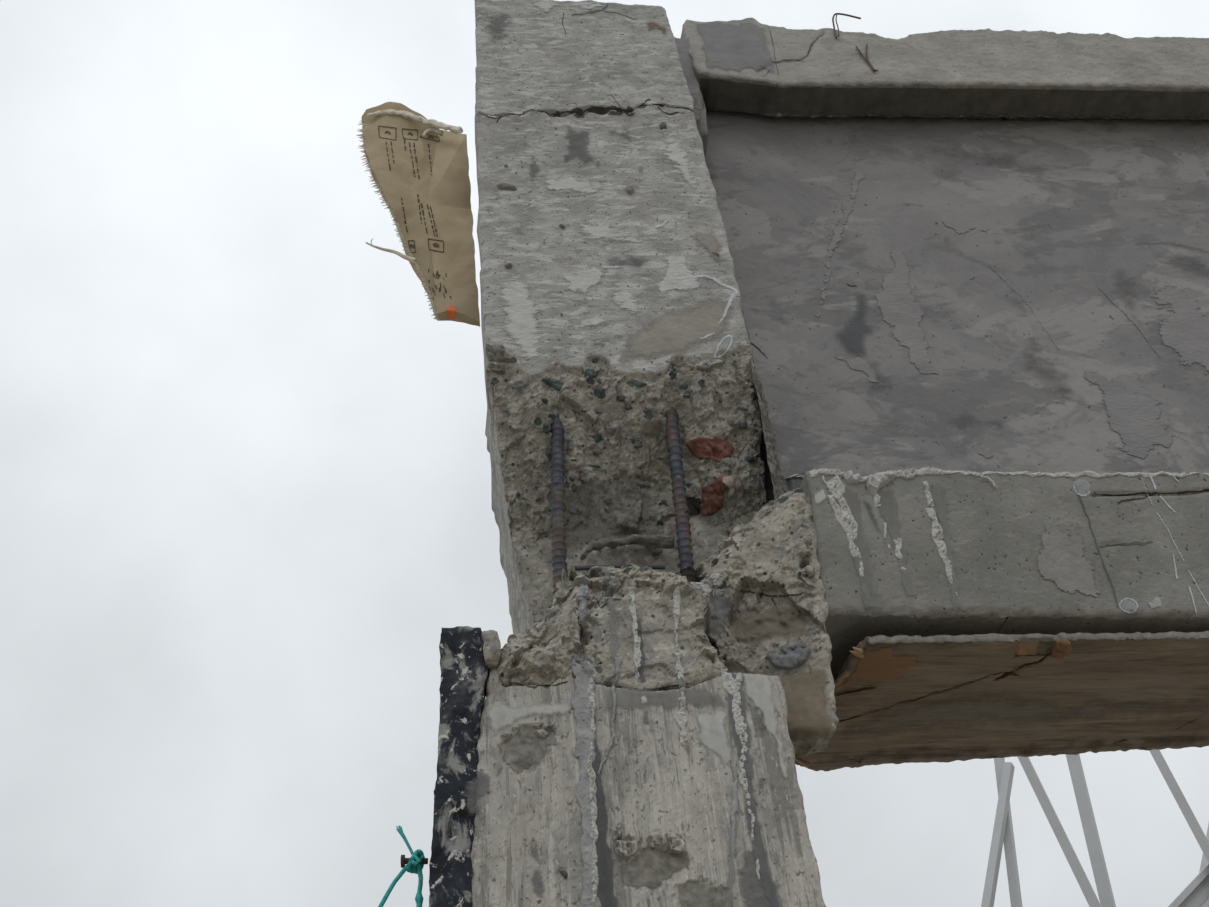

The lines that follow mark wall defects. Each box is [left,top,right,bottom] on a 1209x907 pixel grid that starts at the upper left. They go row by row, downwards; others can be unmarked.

crack [479,94,692,123]
damp [836,247,939,386]
spalling [486,341,839,756]
crack [1075,484,1209,607]
damp [488,569,788,907]